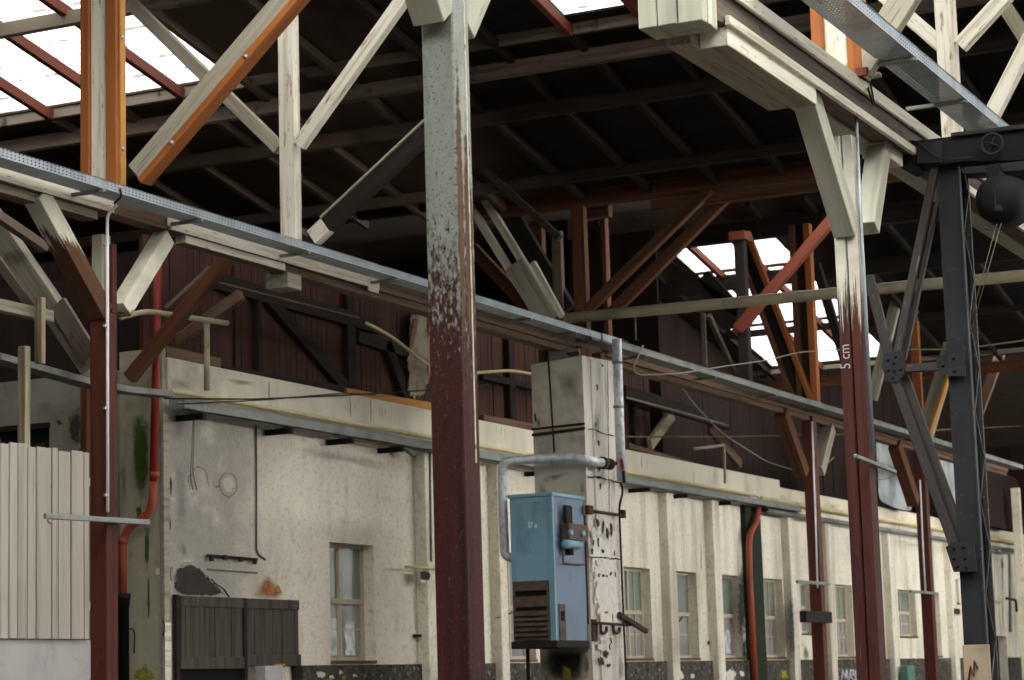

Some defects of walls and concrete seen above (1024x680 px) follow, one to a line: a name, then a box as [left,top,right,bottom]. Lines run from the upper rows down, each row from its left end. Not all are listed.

spalling [155,562,230,597]
peeling [589,515,625,667]